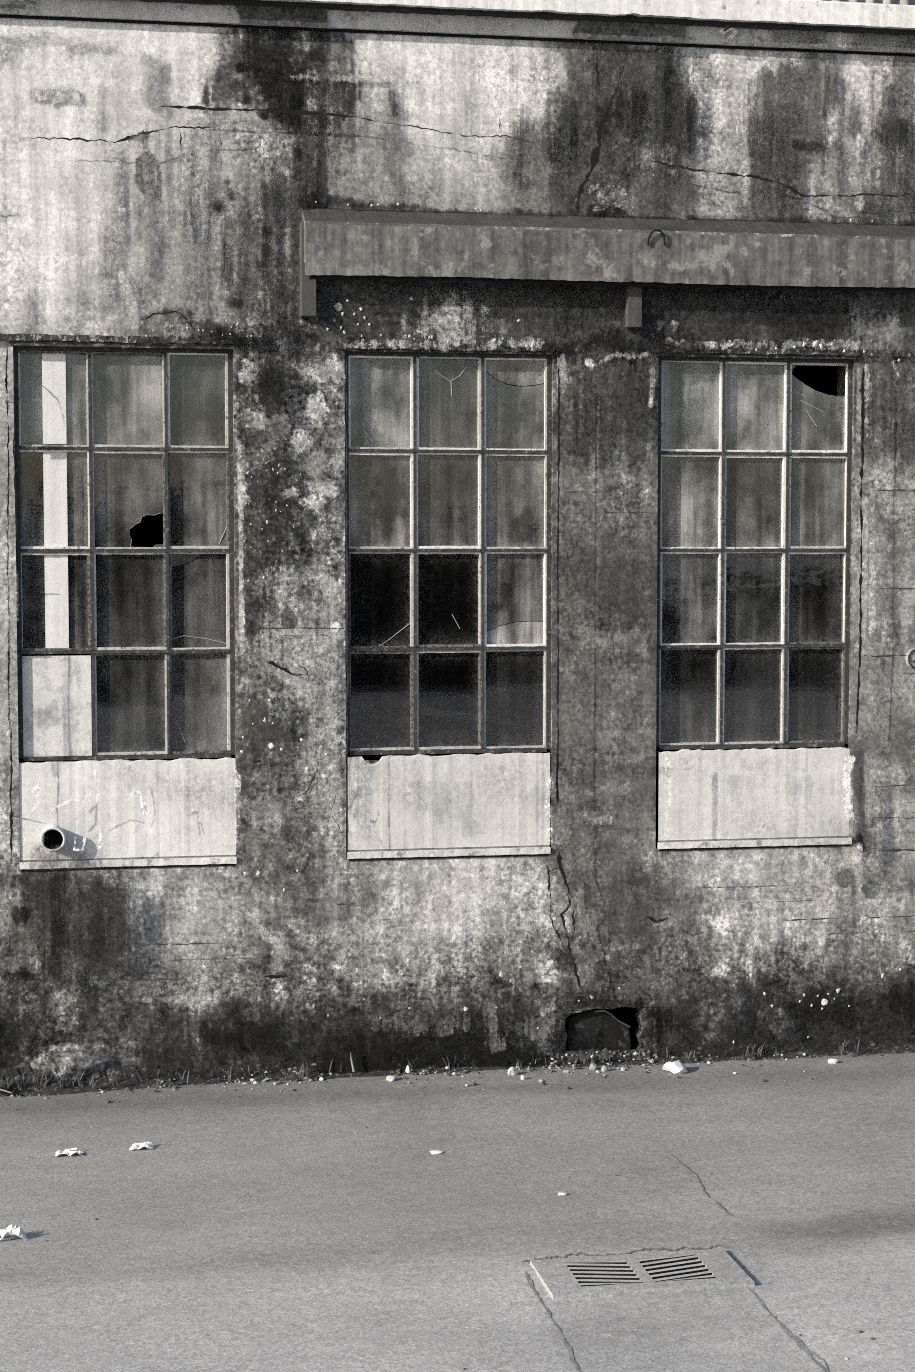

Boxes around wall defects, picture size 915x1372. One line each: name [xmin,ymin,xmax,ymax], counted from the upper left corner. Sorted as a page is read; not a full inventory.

water stain [29,86,81,106]
crack [24,105,537,150]
crack [651,160,915,199]
water stain [98,4,915,771]
water stain [0,870,131,1080]
water stain [249,835,322,959]
peeling [372,1013,470,1037]
peeling [484,1000,506,1053]
water stain [125,893,915,1081]
crack [512,850,652,999]
spalling [523,999,650,1052]
water stain [804,745,915,967]